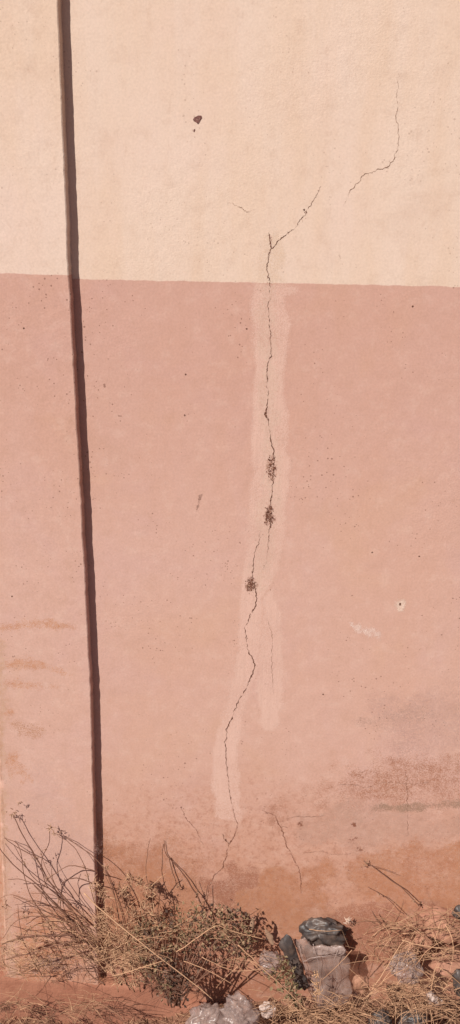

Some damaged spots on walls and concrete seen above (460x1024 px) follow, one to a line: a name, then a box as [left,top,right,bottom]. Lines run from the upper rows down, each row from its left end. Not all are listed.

crack [206,189,320,906]
crack [262,810,351,887]